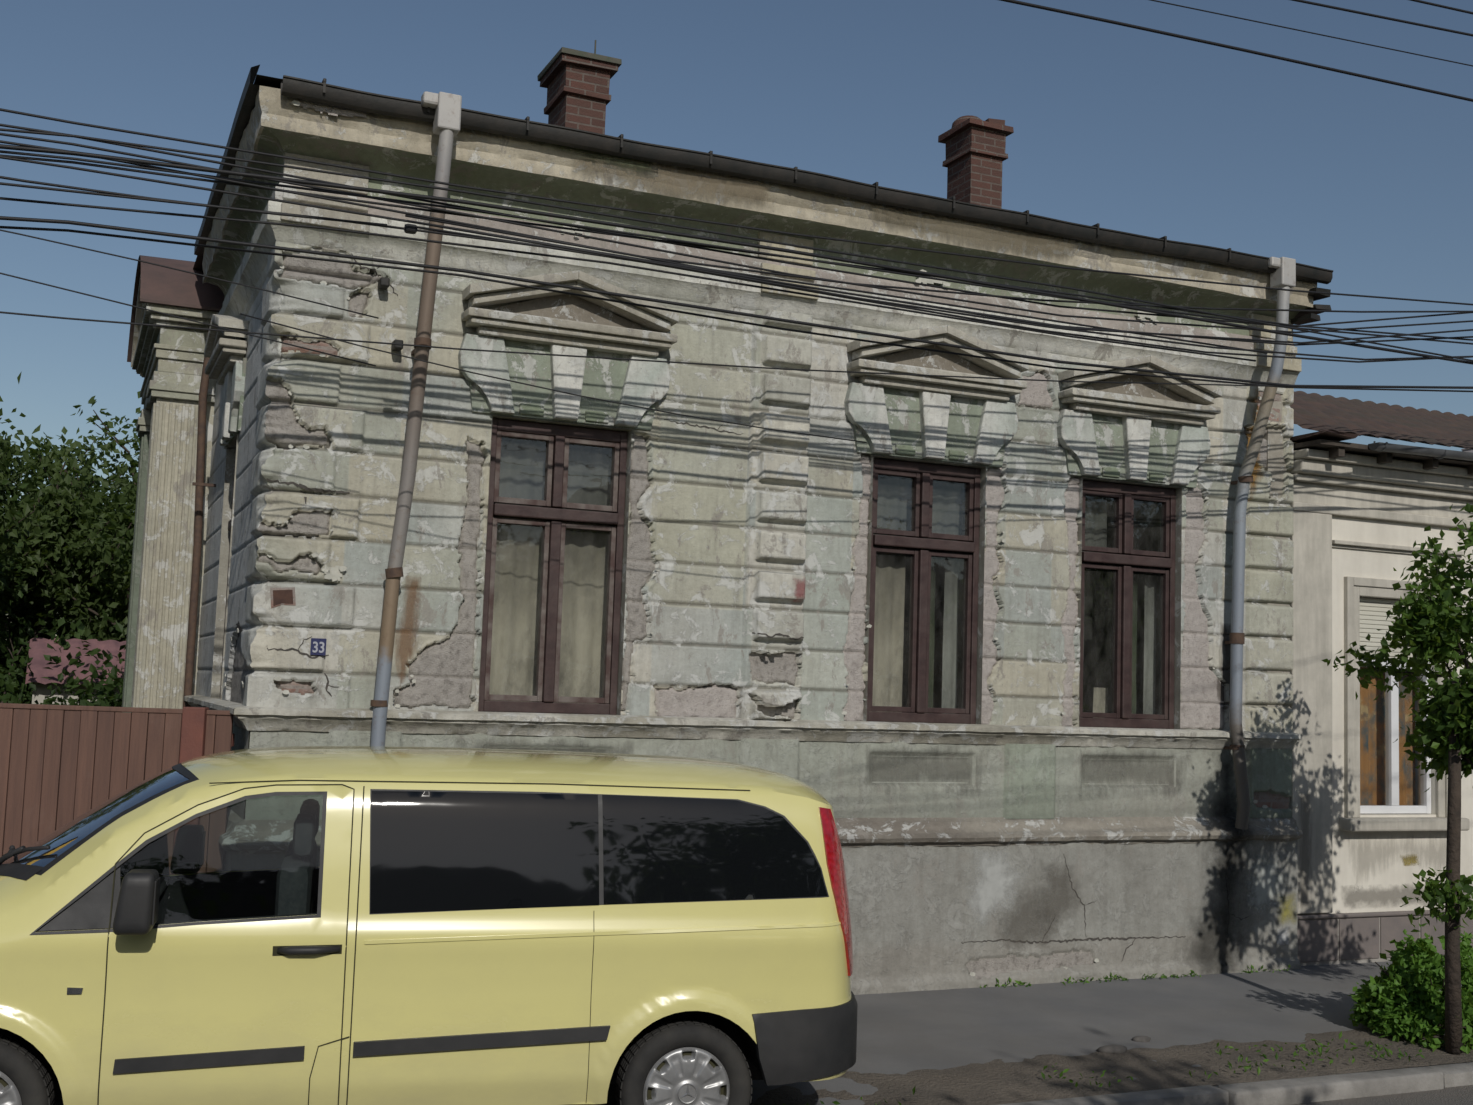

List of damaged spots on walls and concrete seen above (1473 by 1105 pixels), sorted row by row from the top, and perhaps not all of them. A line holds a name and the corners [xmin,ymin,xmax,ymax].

spalling [265,380,330,450]
spalling [257,511,347,608]
spalling [393,440,484,709]
spalling [222,628,253,704]
damp [970,854,1018,921]
damp [1196,763,1283,962]